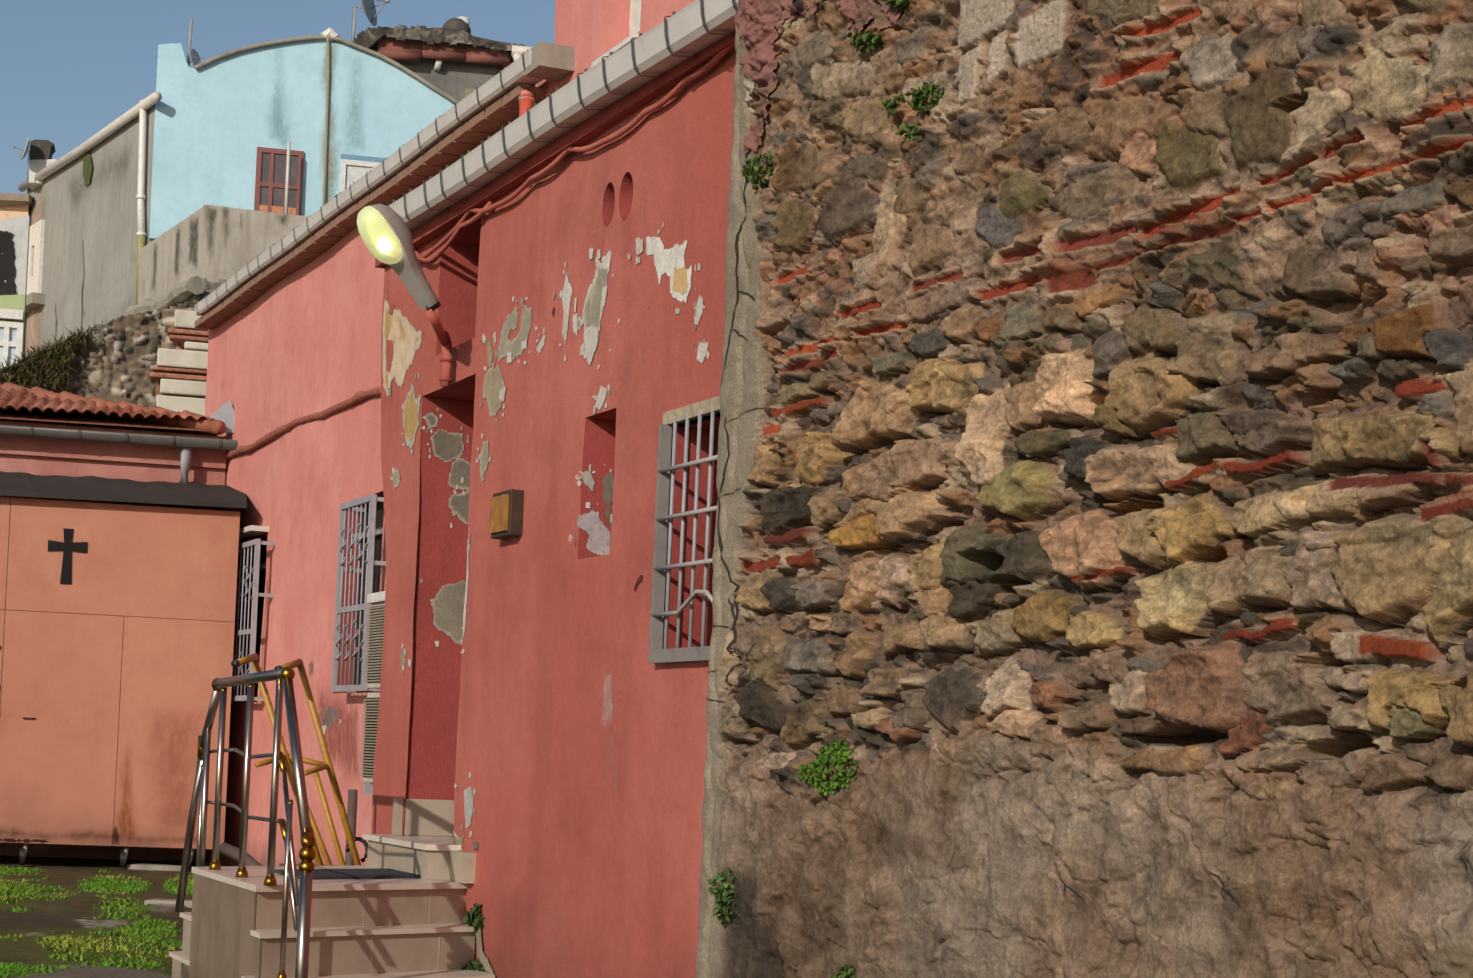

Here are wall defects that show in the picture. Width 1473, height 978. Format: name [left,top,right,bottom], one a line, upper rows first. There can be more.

damp [175,210,226,272]
peeling [382,223,709,654]
crack [1054,862,1085,905]
crack [1208,871,1240,906]